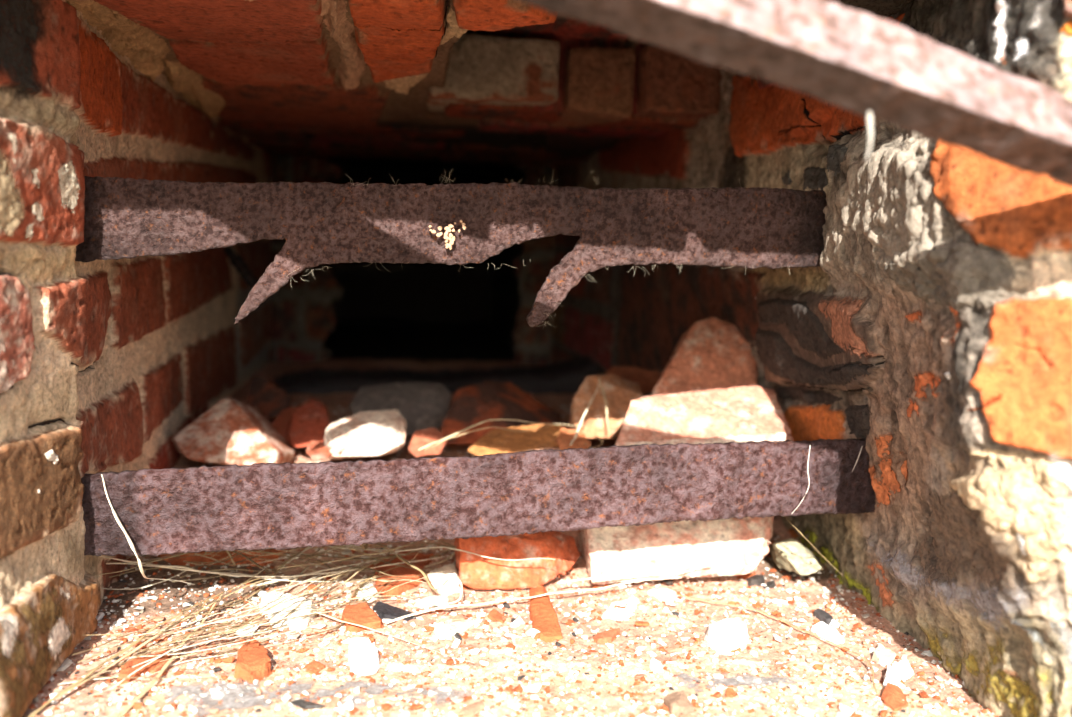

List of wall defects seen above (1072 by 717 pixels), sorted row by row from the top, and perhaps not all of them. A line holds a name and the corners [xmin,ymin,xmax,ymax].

water stain [994,0,1007,58]